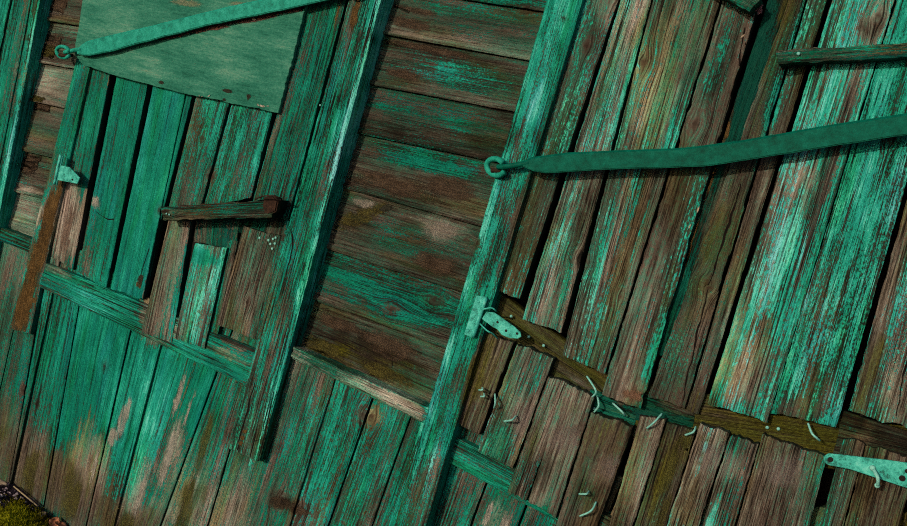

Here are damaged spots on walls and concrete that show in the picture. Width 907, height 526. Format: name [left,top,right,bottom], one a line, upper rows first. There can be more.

spalling [684,165,717,267]
peeling [90,399,131,481]
peeling [133,376,194,515]